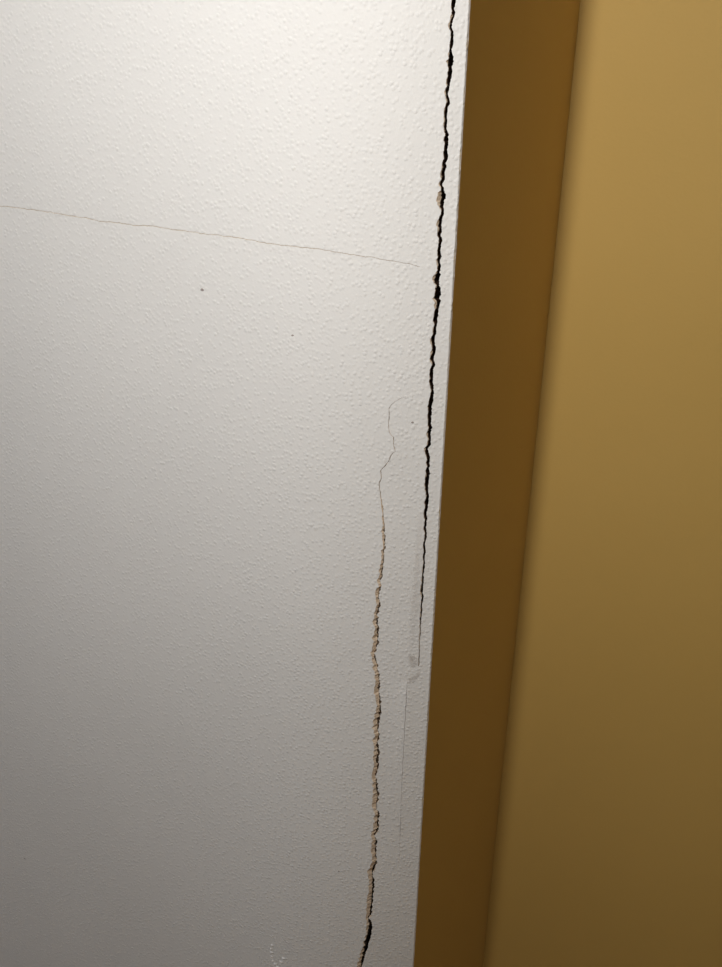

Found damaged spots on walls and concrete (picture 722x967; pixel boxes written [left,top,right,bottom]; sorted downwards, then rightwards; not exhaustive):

crack [0,0,456,967]